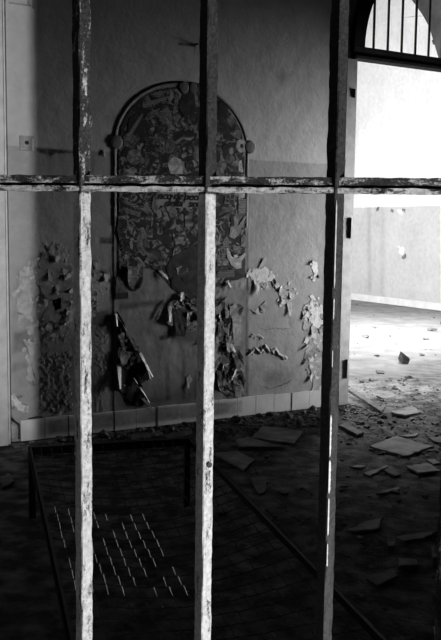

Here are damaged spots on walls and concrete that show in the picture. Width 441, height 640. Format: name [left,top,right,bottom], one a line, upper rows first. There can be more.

peeling [10,244,74,387]
peeling [91,259,114,317]
spalling [10,394,43,439]